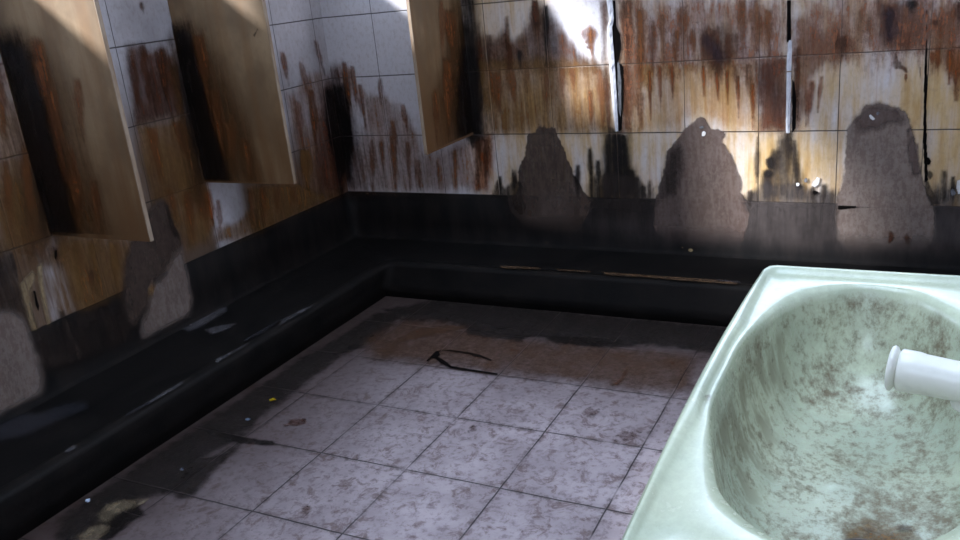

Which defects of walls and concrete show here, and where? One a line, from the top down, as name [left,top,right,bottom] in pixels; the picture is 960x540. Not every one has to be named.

rust [128,45,181,123]
rust [622,0,960,130]
rust [0,73,32,247]
leakage [498,117,752,236]